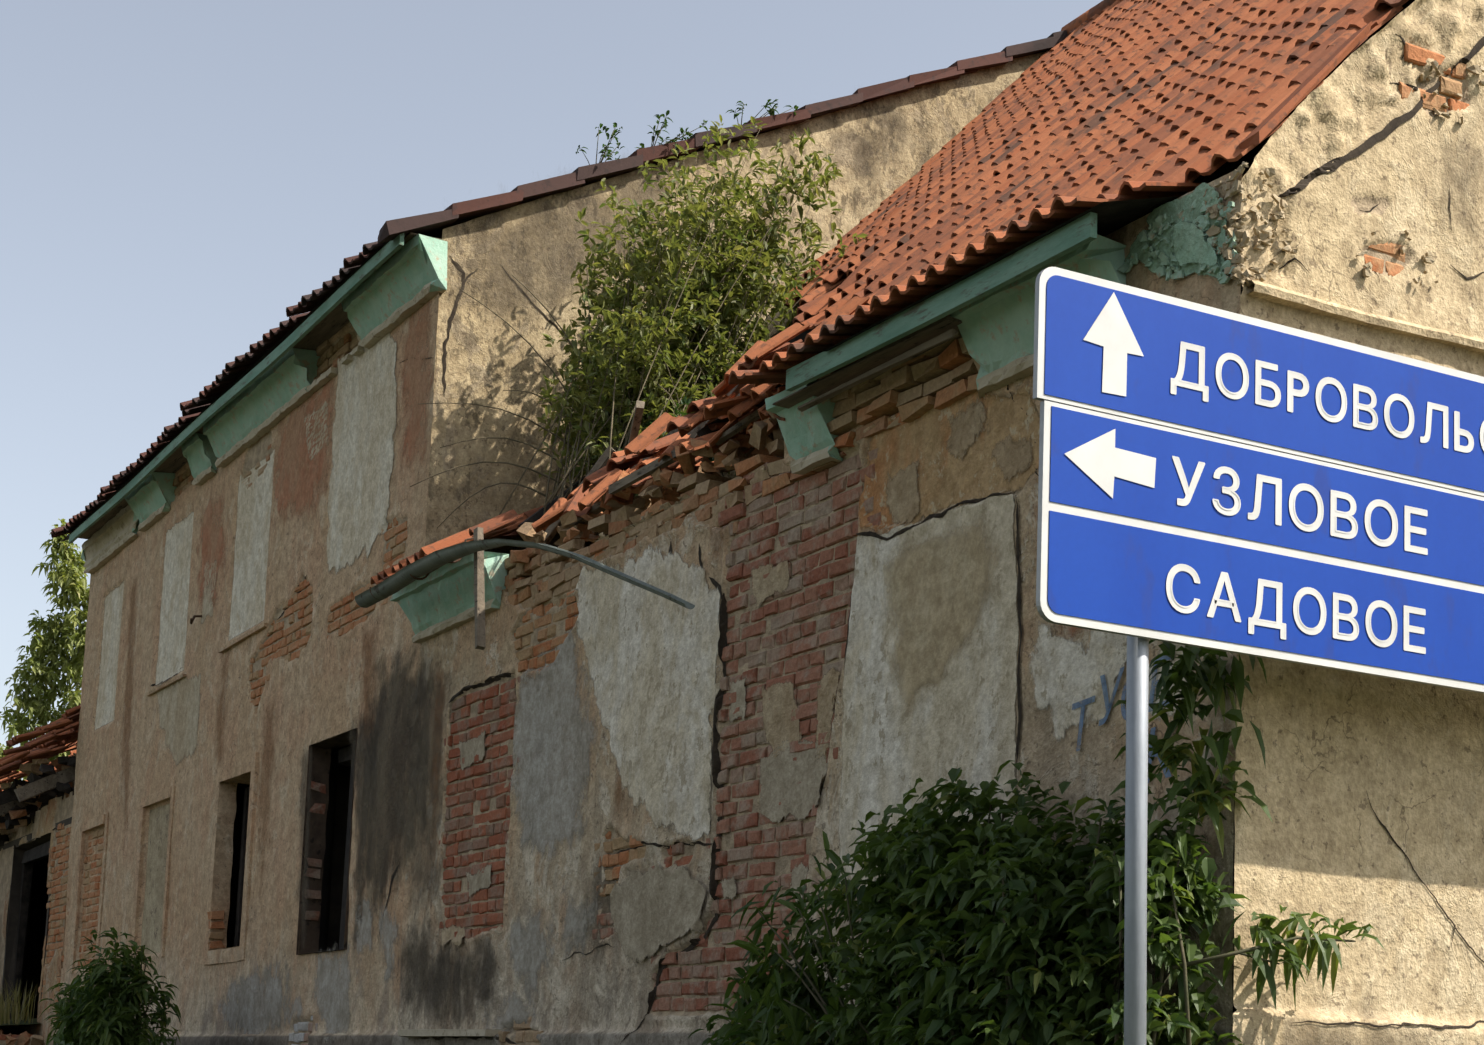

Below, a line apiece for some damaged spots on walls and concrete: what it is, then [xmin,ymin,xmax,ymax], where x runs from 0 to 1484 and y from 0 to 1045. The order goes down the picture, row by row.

crack [1278,34,1484,198]
spalling [1398,42,1484,124]
crack [400,256,571,396]
peeling [1117,162,1298,287]
crack [1276,257,1308,271]
crack [1448,188,1484,280]
peeling [242,332,408,714]
crack [856,384,1039,774]
peeling [439,381,1127,1012]
peeling [1148,643,1193,719]
crack [1366,791,1484,963]
crack [1293,1020,1484,1029]